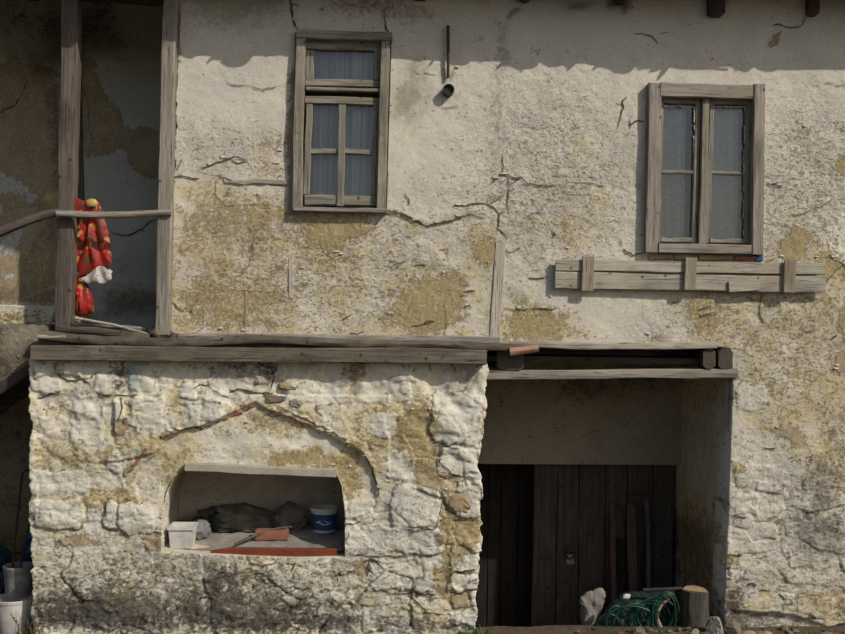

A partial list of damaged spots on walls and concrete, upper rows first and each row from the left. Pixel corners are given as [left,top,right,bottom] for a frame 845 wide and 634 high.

crack [289,0,300,29]
peeling [81,57,159,180]
peeling [0,55,61,306]
crack [110,219,156,236]
peeling [174,181,378,262]
peeling [471,234,503,267]
crack [387,153,606,253]
peeling [774,222,844,279]
peeling [175,264,292,333]
peeling [384,269,472,335]
crack [504,304,559,312]
crack [195,369,382,500]